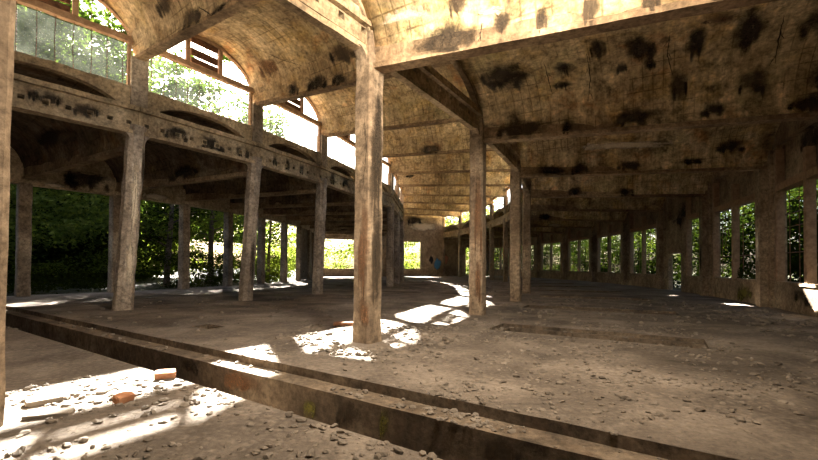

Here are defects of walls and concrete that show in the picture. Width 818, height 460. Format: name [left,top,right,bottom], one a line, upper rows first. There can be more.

water stain [157,0,169,17]
water stain [449,0,464,17]
water stain [329,43,356,64]
water stain [671,74,687,101]
water stain [738,67,767,98]